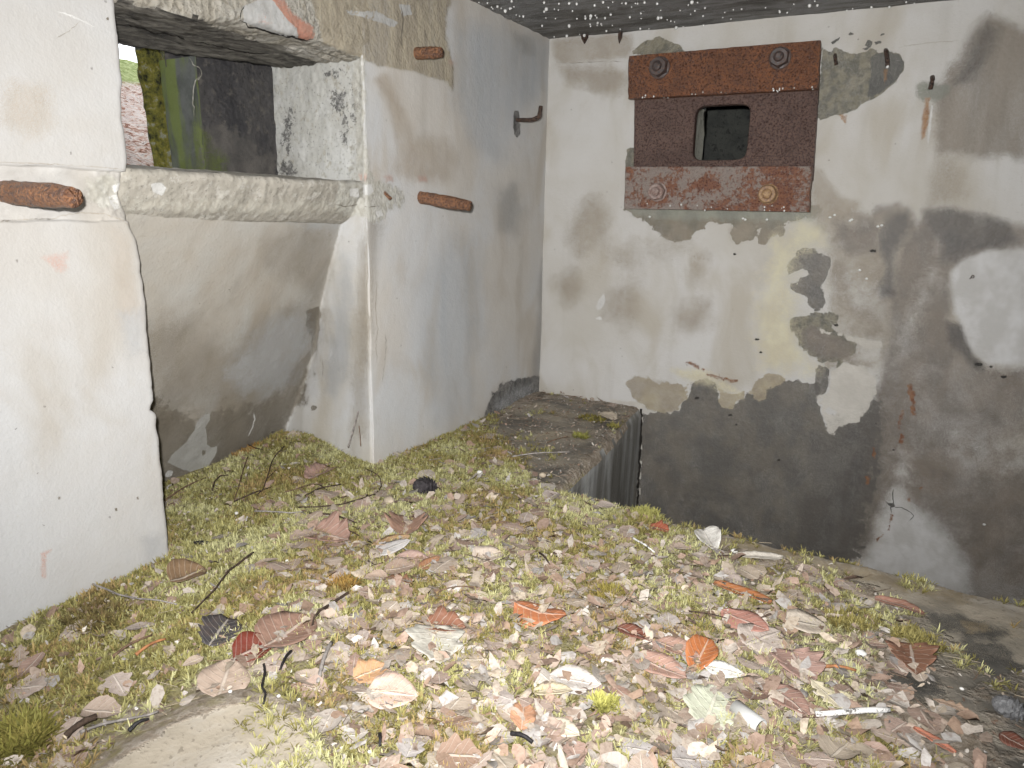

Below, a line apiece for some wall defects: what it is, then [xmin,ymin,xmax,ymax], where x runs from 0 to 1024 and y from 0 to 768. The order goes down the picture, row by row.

spalling [258,0,455,224]
spalling [818,32,905,120]
corrosion [920,97,933,145]
damp [485,10,1024,604]